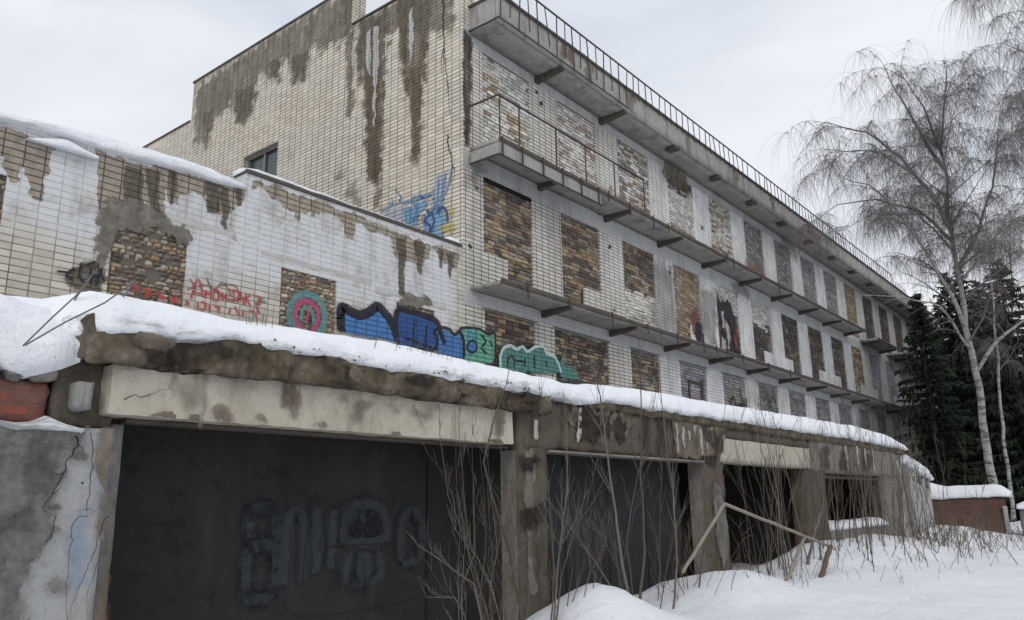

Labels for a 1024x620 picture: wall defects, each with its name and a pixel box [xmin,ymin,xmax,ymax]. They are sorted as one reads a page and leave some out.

peeling [0,127,56,202]
peeling [94,149,472,297]
water stain [193,0,454,206]
crack [441,0,455,182]
spalling [566,405,636,445]
peeling [672,419,726,466]
crack [37,432,110,620]
flaking render [518,448,546,595]